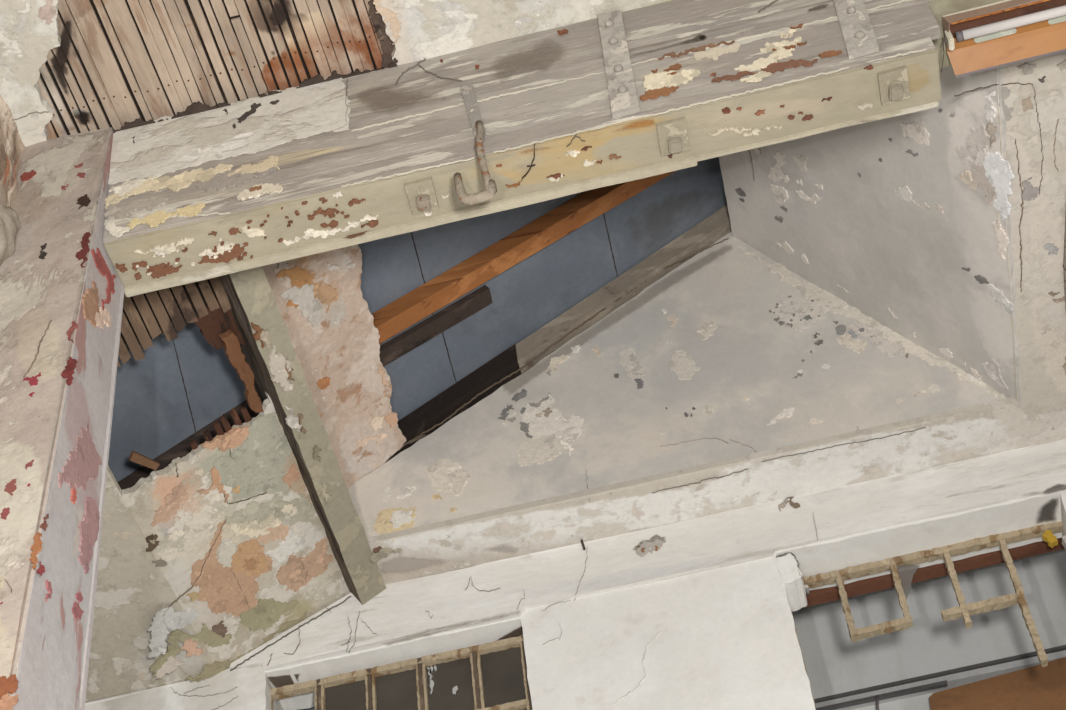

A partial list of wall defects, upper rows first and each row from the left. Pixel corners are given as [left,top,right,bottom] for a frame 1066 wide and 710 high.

spalling [296,58,398,89]
water stain [500,42,560,76]
peeling [640,23,842,101]
spalling [113,90,282,143]
crack [521,143,536,181]
crack [954,82,1059,291]
peeling [251,322,295,392]
peeling [0,479,31,520]
peeling [58,427,102,574]
peeling [29,514,52,602]
peeling [146,405,333,682]
crack [465,546,588,645]